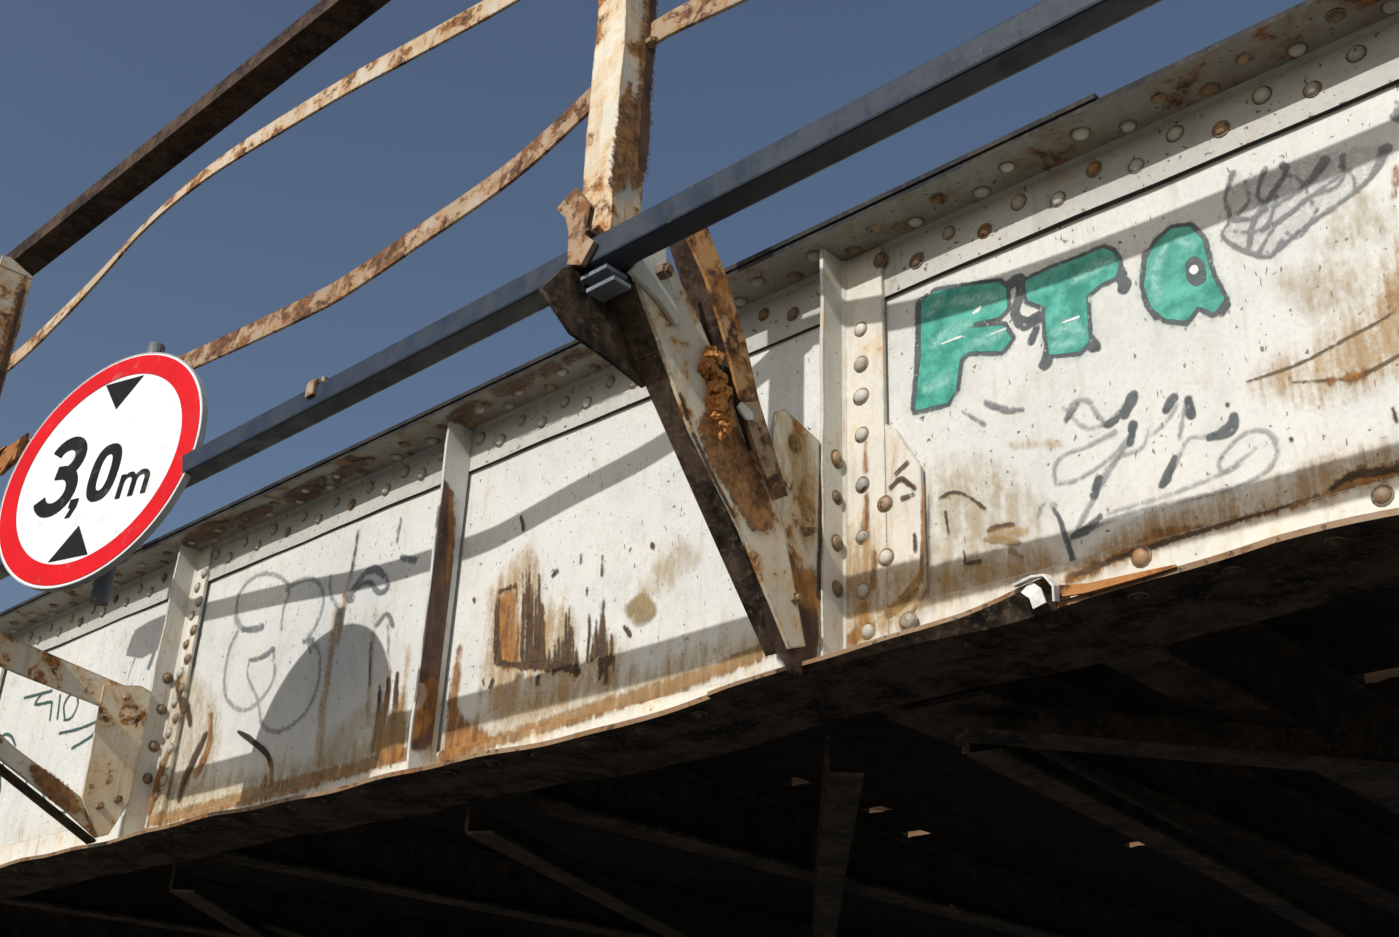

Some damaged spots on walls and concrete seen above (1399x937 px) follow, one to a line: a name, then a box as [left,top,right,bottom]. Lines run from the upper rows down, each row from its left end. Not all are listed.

corrosion [608,0,659,197]
corrosion [0,274,28,392]
corrosion [679,393,775,531]
corrosion [846,460,925,648]
corrosion [1065,450,1399,583]
corrosion [146,438,822,828]
corrosion [30,764,81,812]